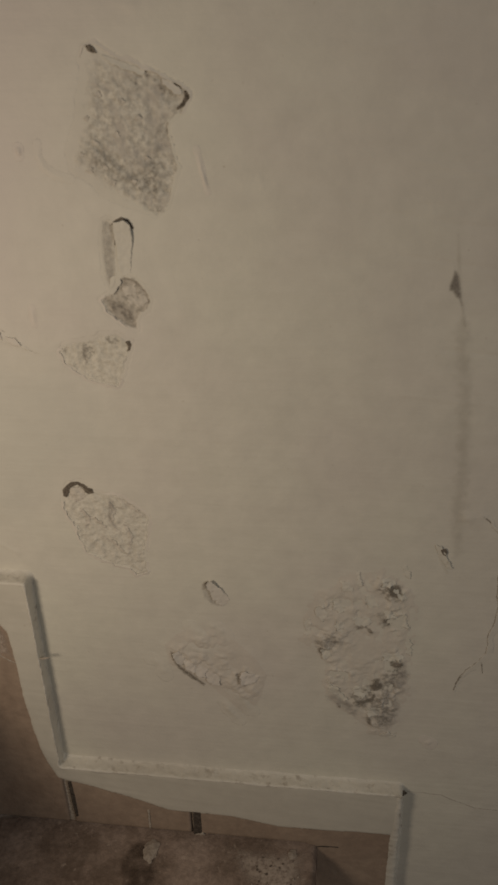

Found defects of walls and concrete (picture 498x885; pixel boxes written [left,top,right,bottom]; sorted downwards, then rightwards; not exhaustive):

spalling [0,38,193,390]
spalling [60,479,153,578]